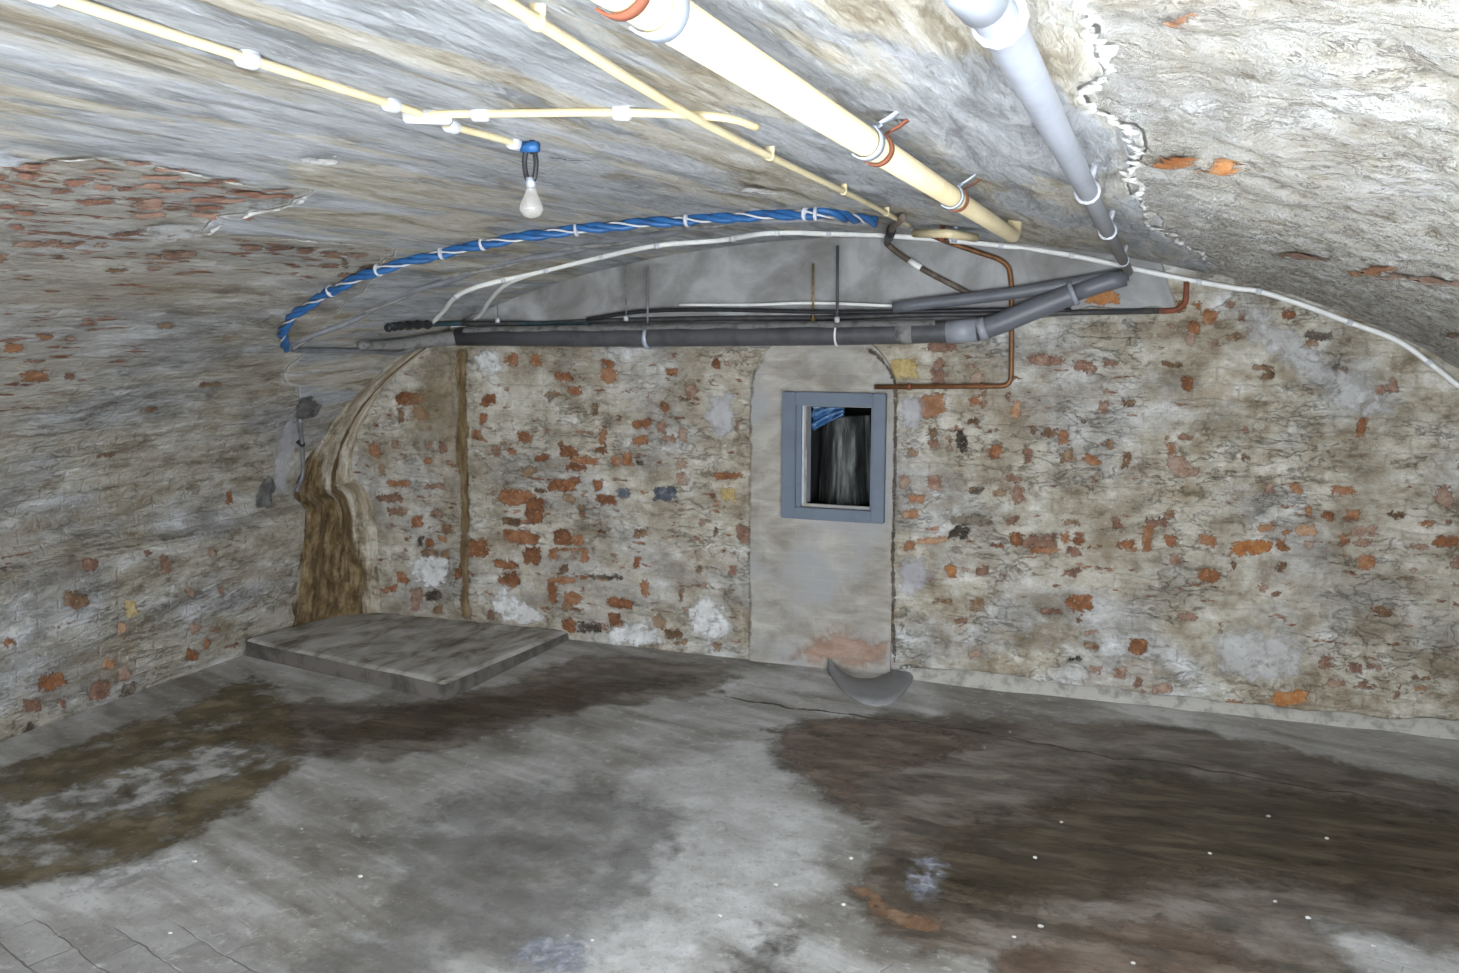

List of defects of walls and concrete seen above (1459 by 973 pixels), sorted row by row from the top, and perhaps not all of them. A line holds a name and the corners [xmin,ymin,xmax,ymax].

peeling [1074,0,1246,268]
water stain [0,623,738,891]
water stain [769,713,1459,973]